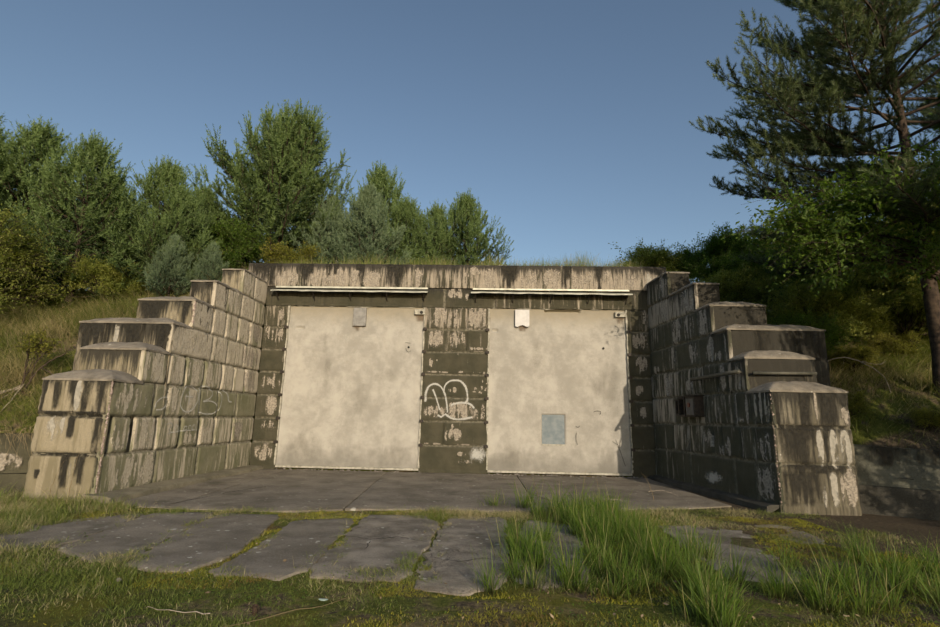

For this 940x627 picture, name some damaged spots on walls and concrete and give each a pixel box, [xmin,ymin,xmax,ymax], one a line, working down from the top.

damp [300,263,314,286]
damp [386,264,406,287]
damp [501,265,517,288]
damp [562,266,571,288]
peeling [428,289,490,352]
peeling [0,453,22,471]
damp [37,380,109,492]
peeling [95,274,284,493]
peeling [424,358,487,463]
peeling [632,277,750,458]
damp [754,392,852,507]
peeling [840,467,858,507]